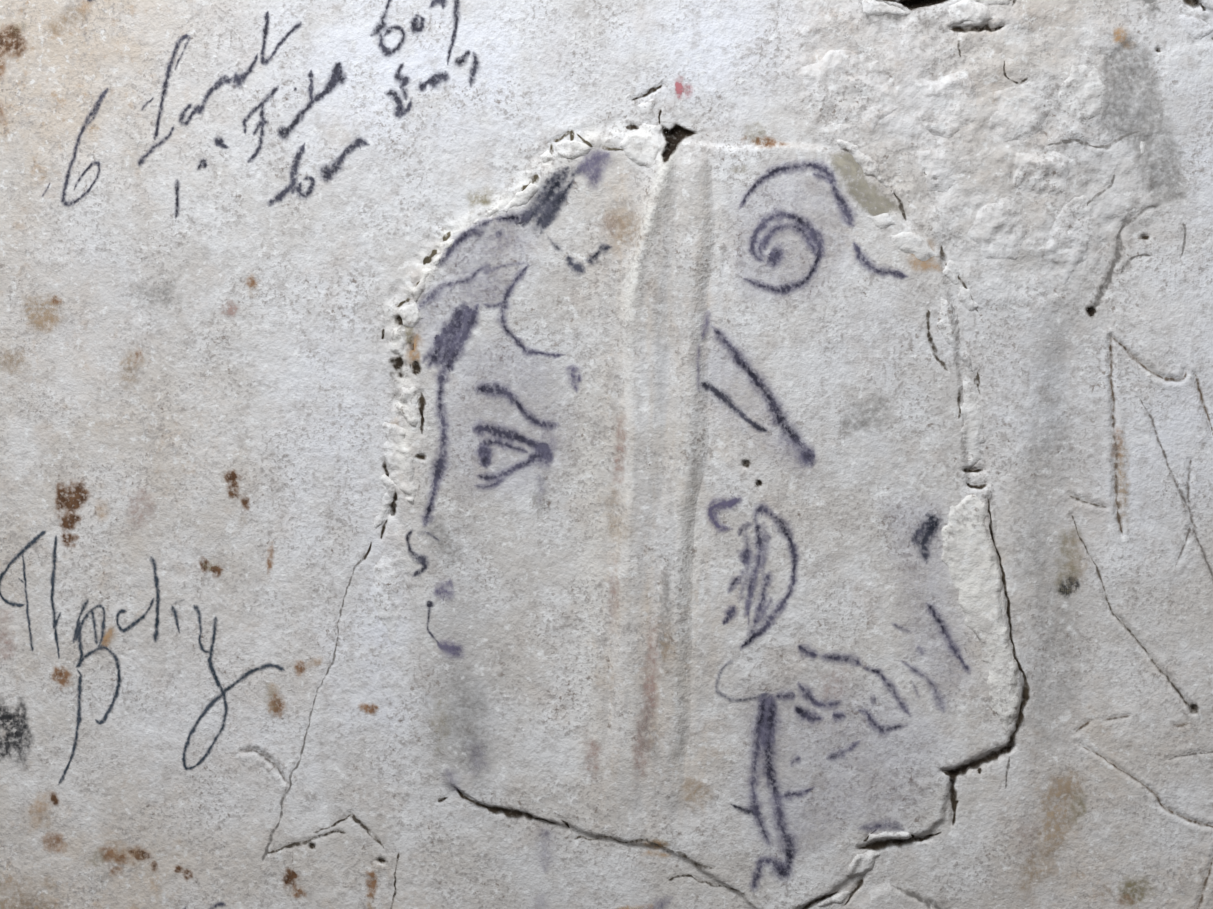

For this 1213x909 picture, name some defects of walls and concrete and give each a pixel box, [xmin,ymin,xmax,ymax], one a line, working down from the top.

flaking render [862,0,910,20]
flaking render [948,0,1011,26]
corrosion [0,25,24,75]
crack [418,394,426,433]
corrosion [225,471,249,509]
corrosion [56,483,89,546]
crack [861,469,1029,850]
crack [263,461,399,904]
crack [438,787,744,894]
crack [803,879,863,909]
crack [897,887,941,909]